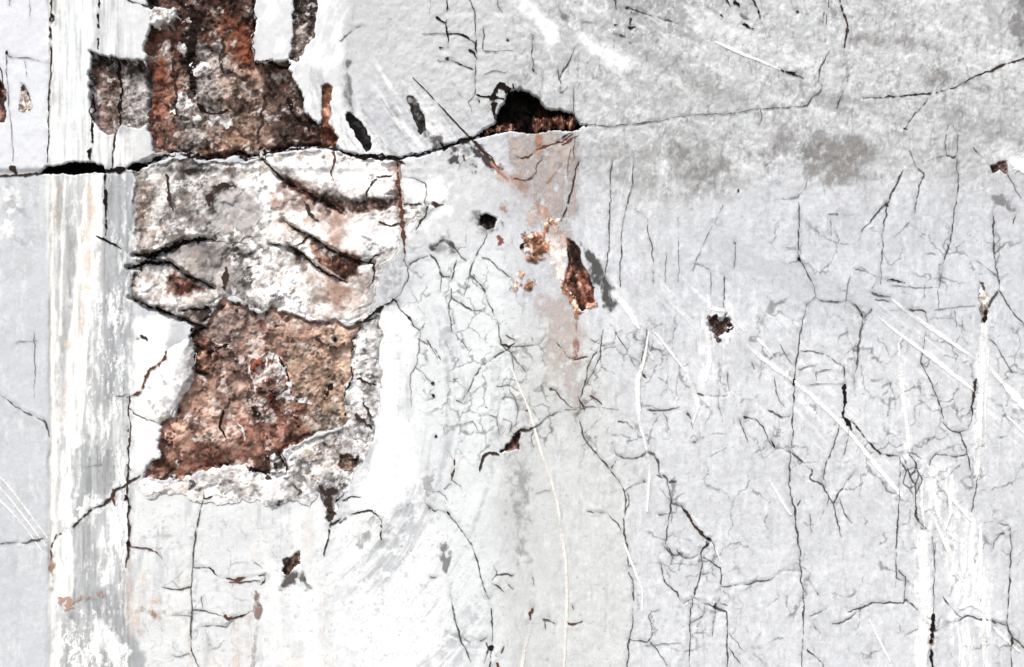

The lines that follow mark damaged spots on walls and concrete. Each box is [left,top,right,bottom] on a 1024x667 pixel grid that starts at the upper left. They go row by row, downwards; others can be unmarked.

crack [0,0,54,163]
crack [422,0,850,220]
crack [0,335,167,568]
flaking render [88,0,420,522]
crack [87,94,774,667]
rust [495,132,617,407]
hole [707,314,734,342]
crack [647,58,1024,667]